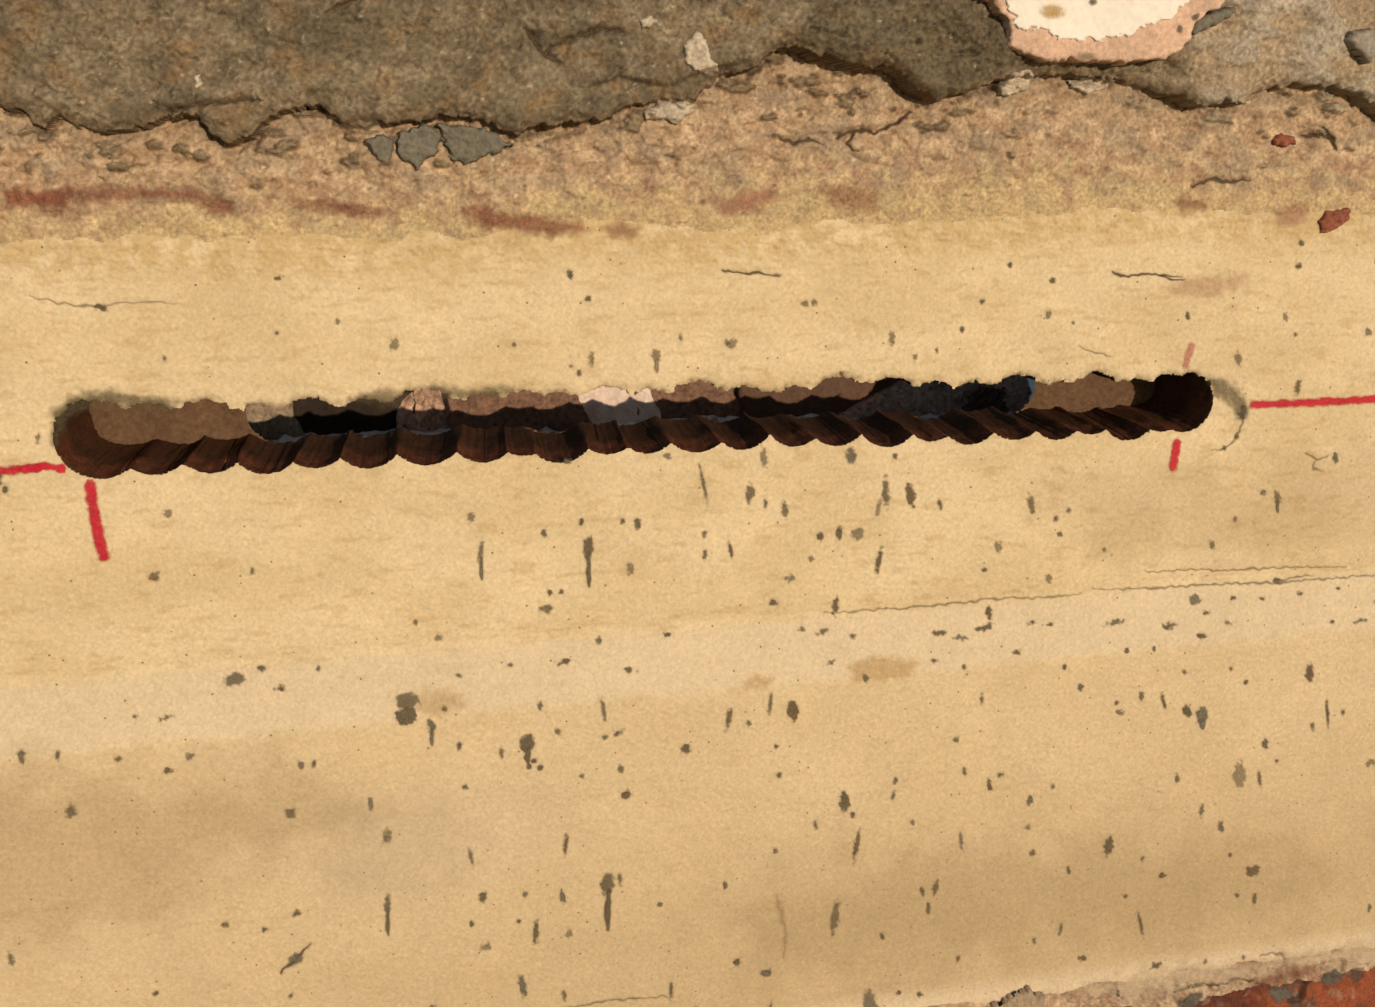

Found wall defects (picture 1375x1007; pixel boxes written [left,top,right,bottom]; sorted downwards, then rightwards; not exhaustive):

spalling [0,0,1375,247]
spalling [928,996,1015,1007]
spalling [1034,947,1375,1007]